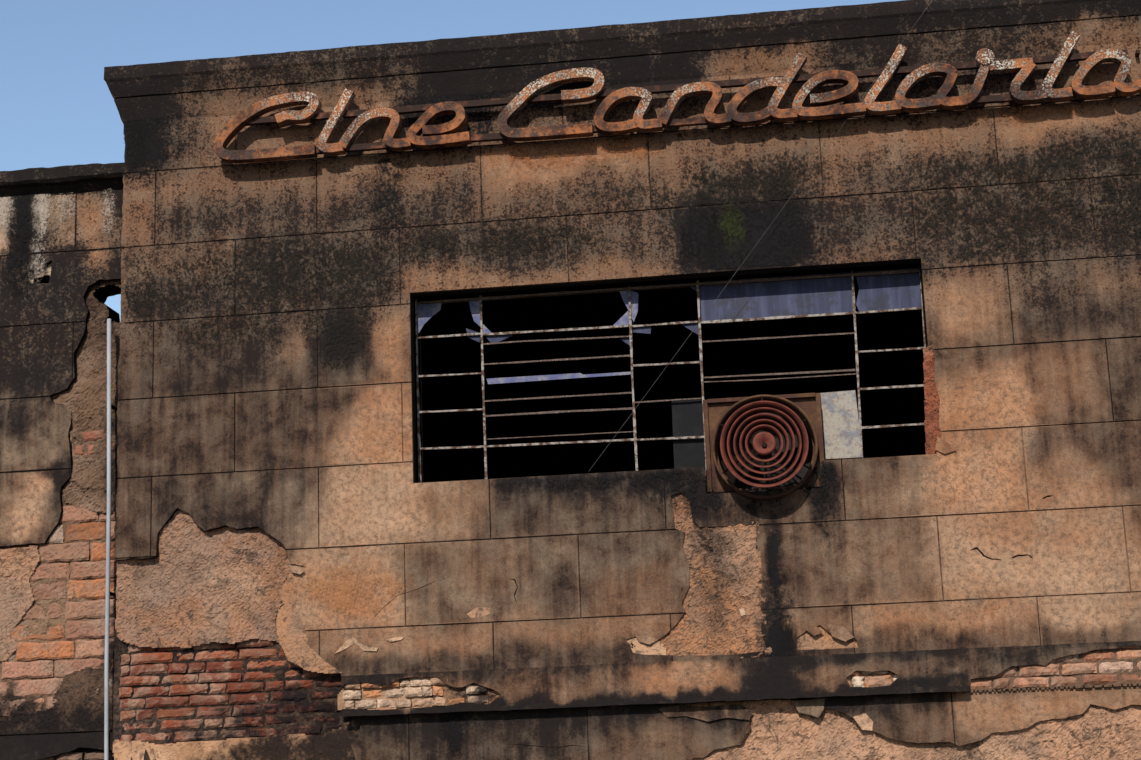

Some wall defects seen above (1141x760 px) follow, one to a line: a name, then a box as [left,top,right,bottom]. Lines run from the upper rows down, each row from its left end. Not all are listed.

leakage [0,194,75,297]
leakage [121,149,833,369]
rust [923,345,957,455]
spalling [0,247,500,760]
spalling [627,493,772,659]
leakage [759,520,797,657]
crack [972,547,1032,560]
flaking render [846,671,899,688]
spalling [658,698,1141,760]
flaking render [970,646,1141,689]